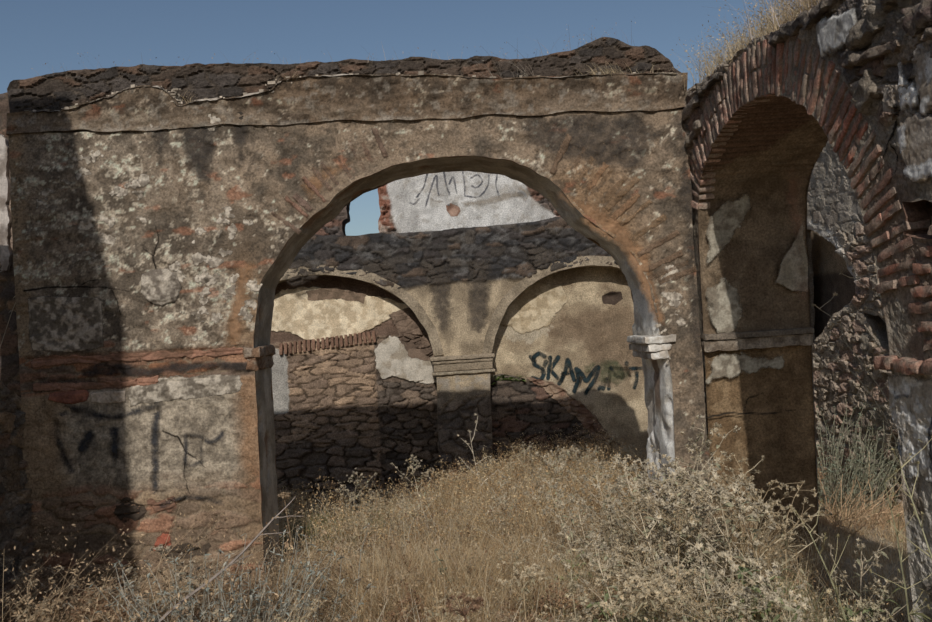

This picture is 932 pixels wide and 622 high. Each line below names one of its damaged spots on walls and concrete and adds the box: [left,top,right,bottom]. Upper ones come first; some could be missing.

peeling [706,195,751,263]
crack [23,280,129,315]
leakage [363,260,395,280]
leakage [424,262,450,330]
leakage [469,260,489,332]
peeling [706,278,742,333]
spalling [389,308,434,361]
peeling [706,353,784,384]